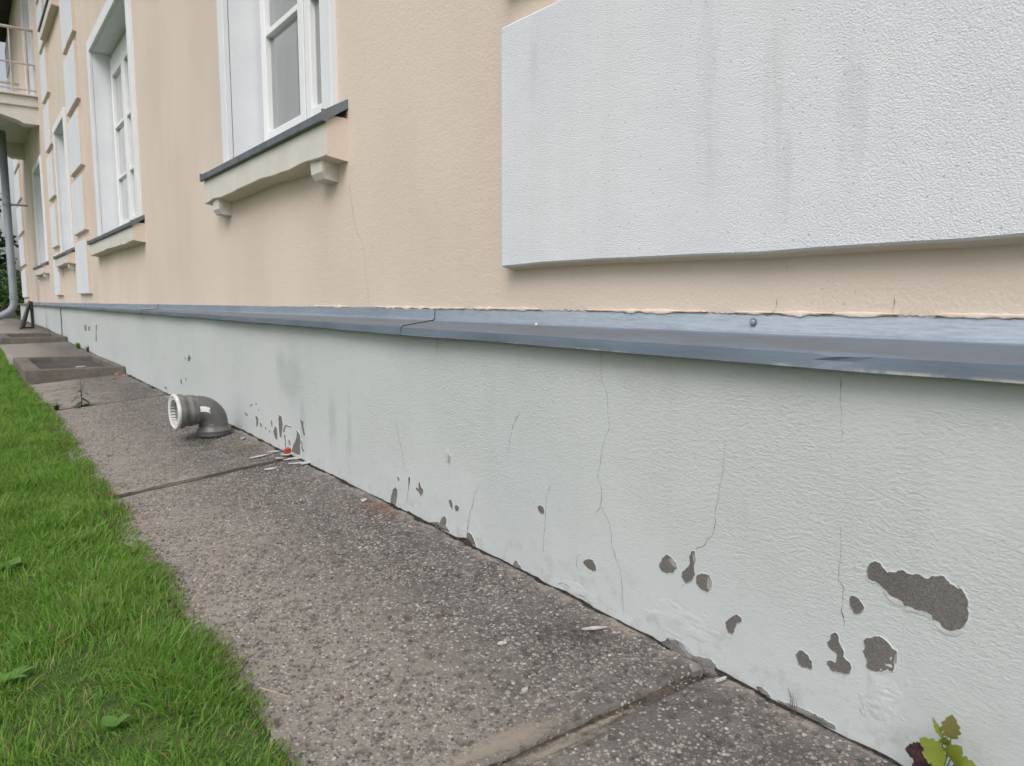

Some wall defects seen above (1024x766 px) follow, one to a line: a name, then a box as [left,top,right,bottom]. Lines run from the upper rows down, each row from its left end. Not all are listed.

peeling [244,402,306,458]
peeling [391,476,424,507]
spalling [430,499,459,532]
peeling [583,558,597,572]
peeling [659,550,713,594]
peeling [866,560,971,636]
peeling [725,614,743,635]
peeling [795,649,813,671]
peeling [826,632,852,676]
peeling [862,635,898,674]